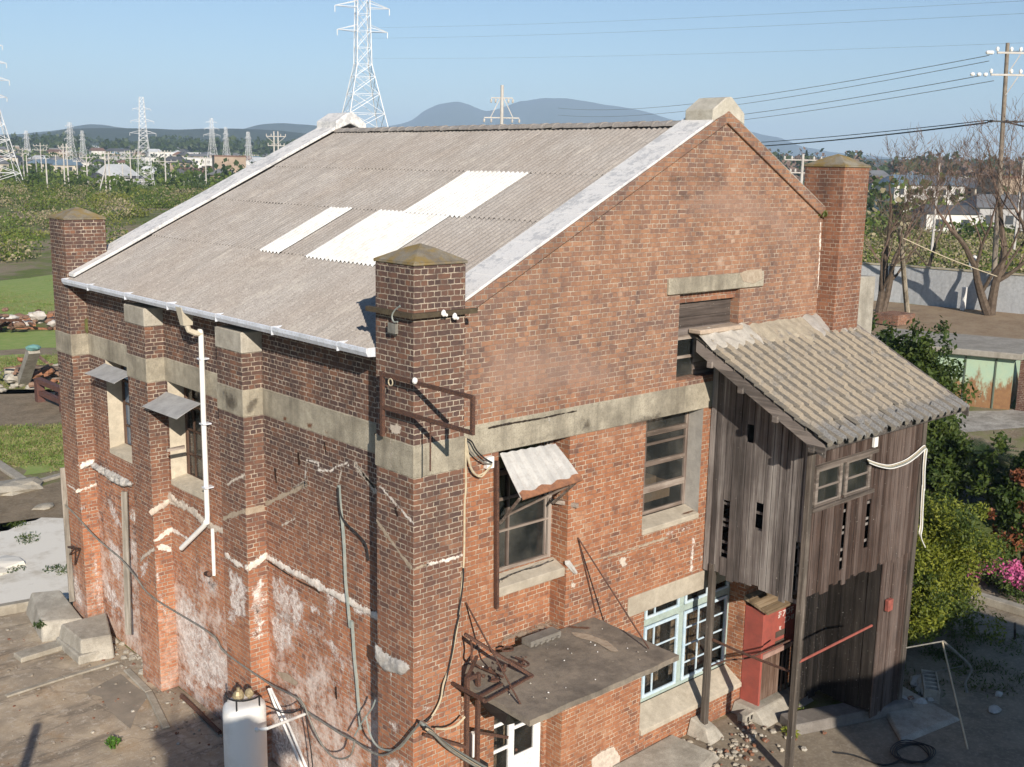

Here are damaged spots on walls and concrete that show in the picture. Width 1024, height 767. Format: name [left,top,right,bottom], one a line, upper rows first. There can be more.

efflorescence [94,541,160,609]
efflorescence [228,568,336,650]
crack [268,561,352,607]
efflorescence [165,595,228,707]